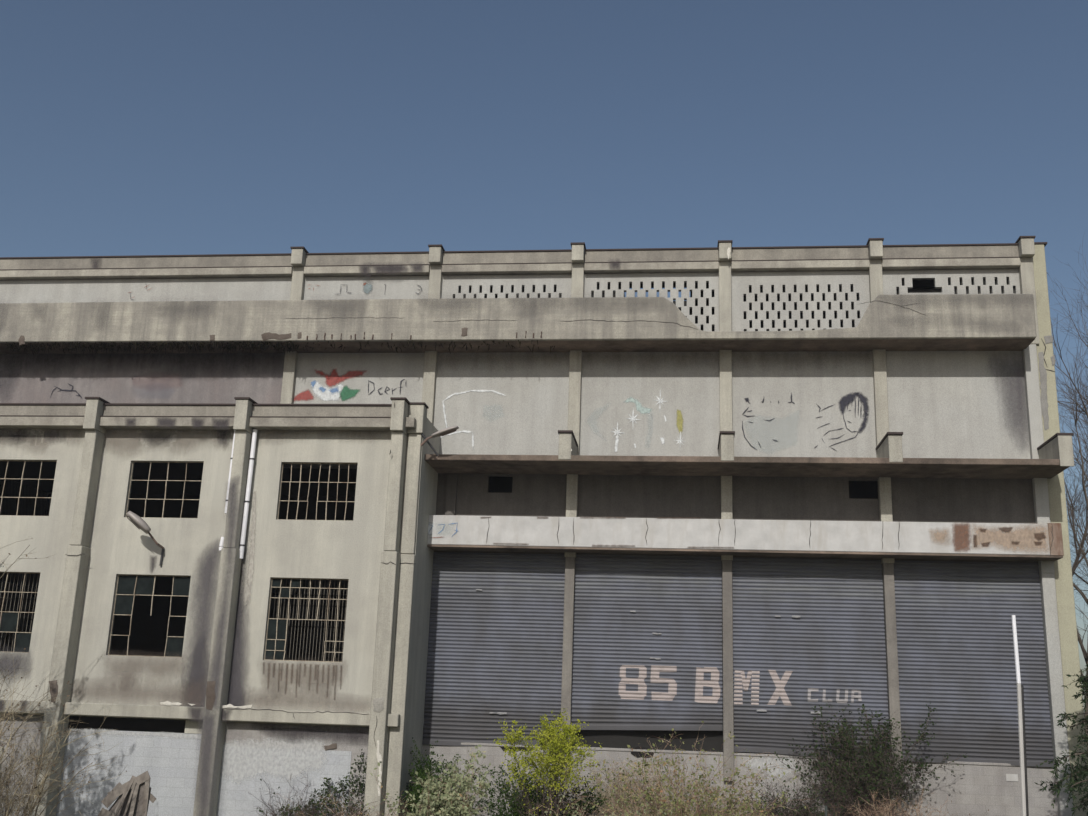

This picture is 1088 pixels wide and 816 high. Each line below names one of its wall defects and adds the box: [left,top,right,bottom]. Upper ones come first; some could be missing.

water stain [1001,361,1027,429]
water stain [187,483,256,816]